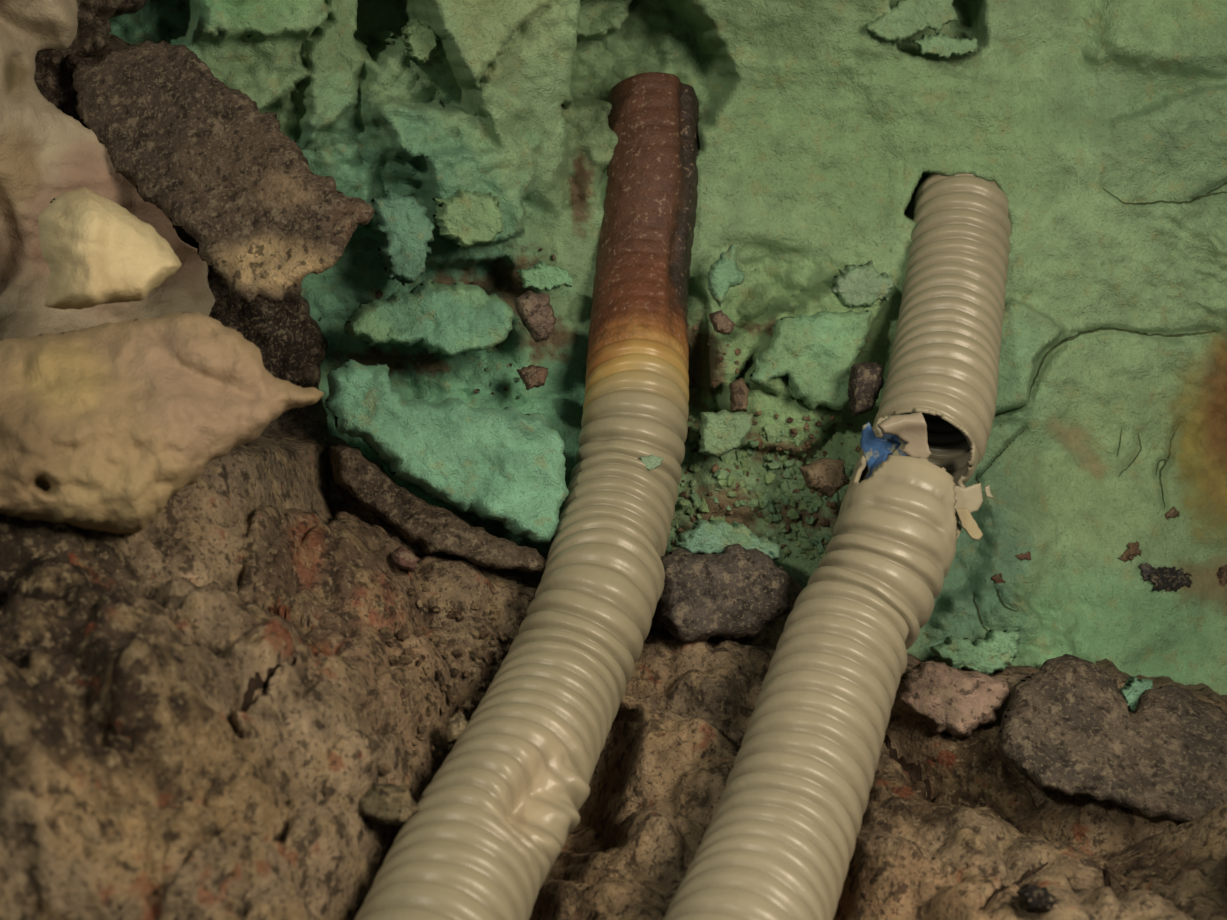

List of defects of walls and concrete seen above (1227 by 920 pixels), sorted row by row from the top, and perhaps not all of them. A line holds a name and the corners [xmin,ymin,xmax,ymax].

peeling [401,18,439,63]
peeling [865,0,978,59]
flaking render [65,40,376,307]
corrosion [1182,339,1227,526]